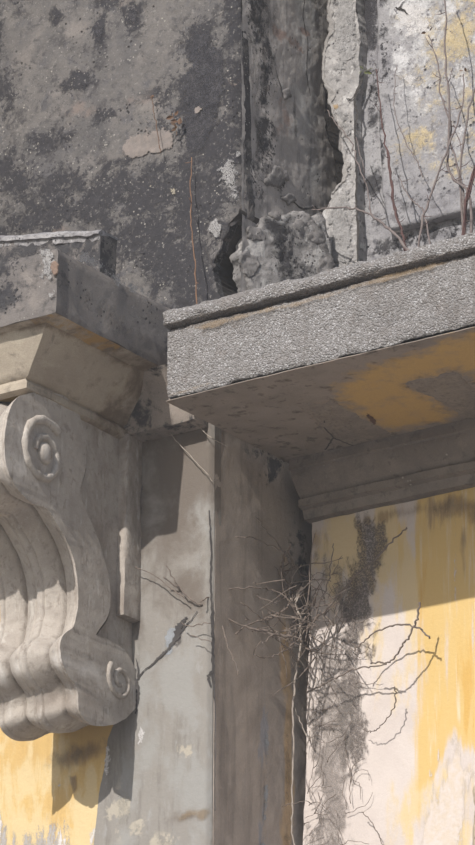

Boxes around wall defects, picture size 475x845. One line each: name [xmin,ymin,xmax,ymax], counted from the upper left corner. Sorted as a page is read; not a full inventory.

water stain [181,25,224,151]
crack [280,0,364,262]
crack [204,205,260,296]
flaking render [229,165,335,293]
crack [135,510,216,802]
water stain [310,516,387,845]
peeling [0,816,71,845]